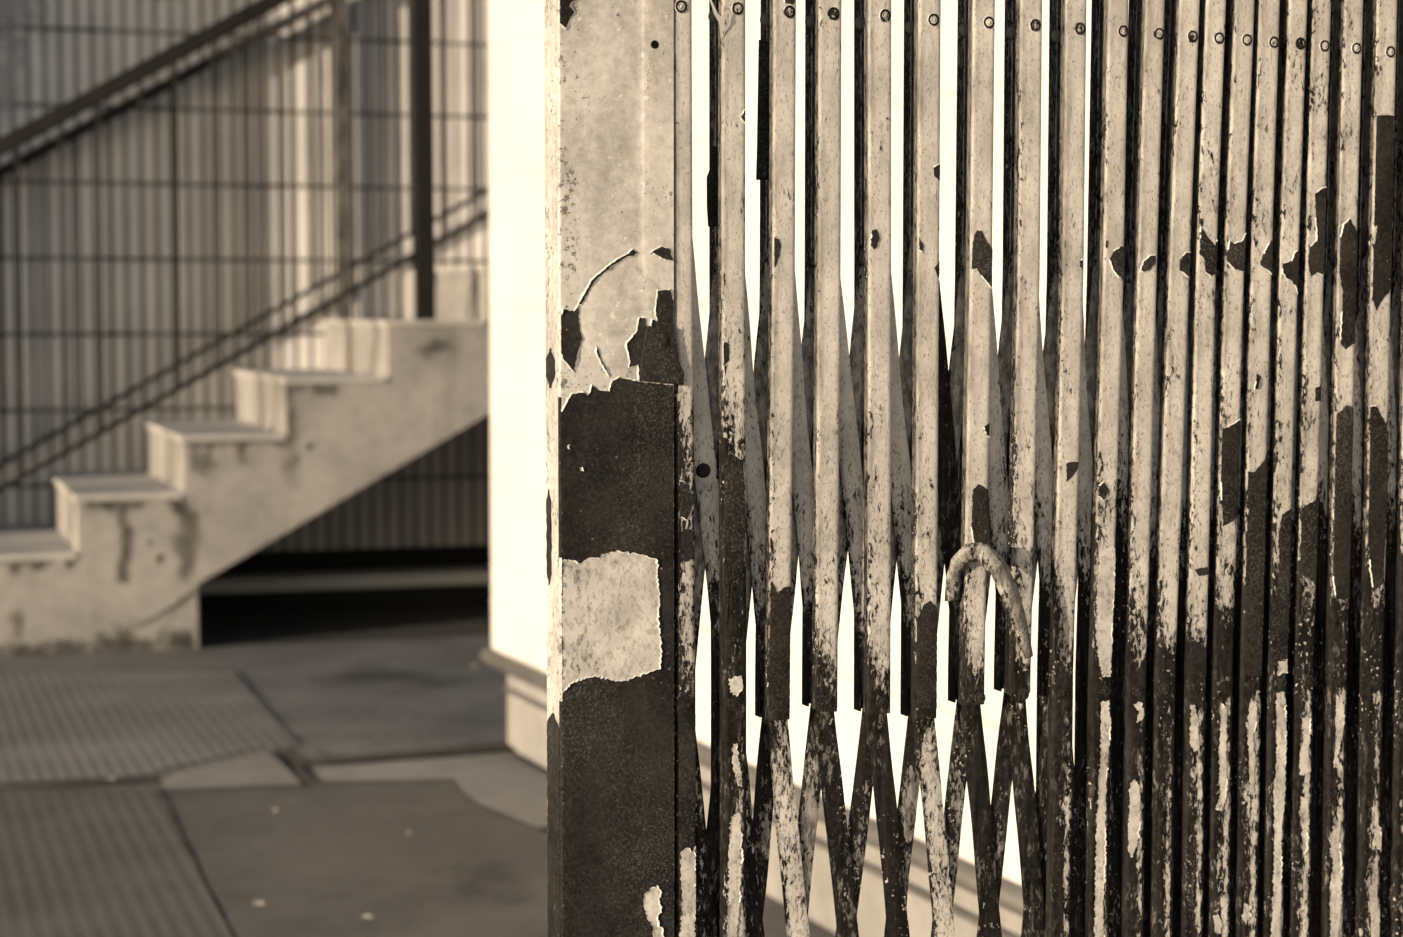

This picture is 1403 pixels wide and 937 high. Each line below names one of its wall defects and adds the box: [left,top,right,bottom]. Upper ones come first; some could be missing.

peeling [560,0,578,30]
peeling [545,245,696,937]